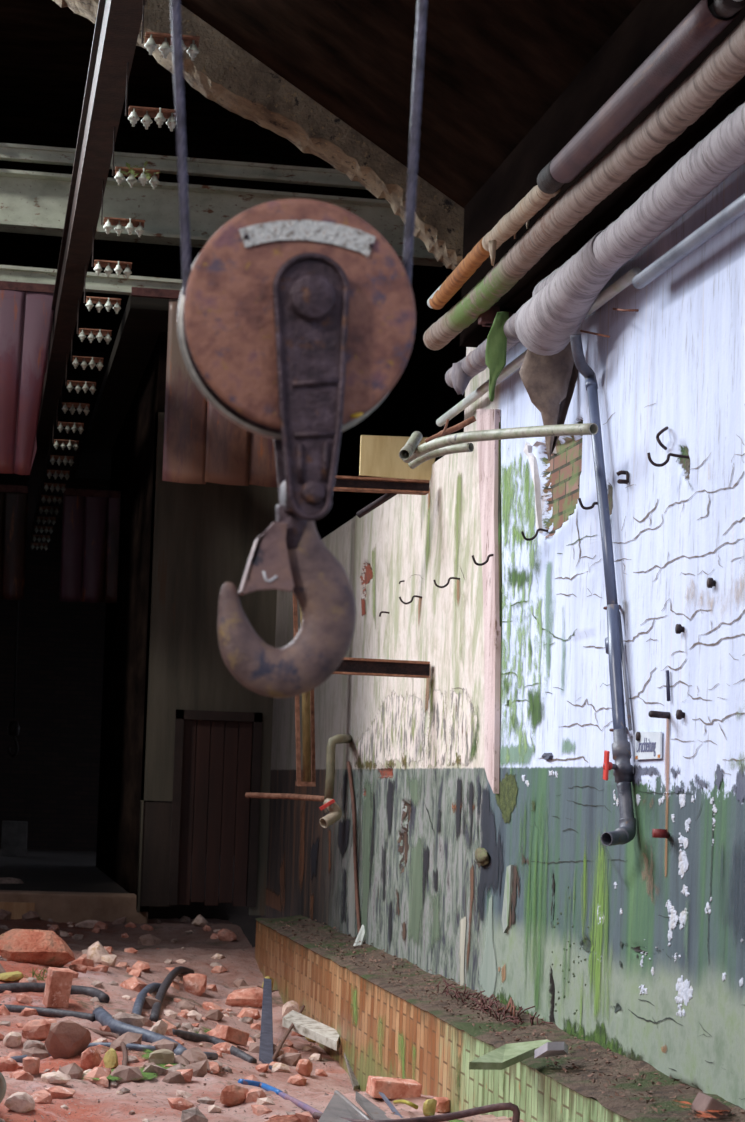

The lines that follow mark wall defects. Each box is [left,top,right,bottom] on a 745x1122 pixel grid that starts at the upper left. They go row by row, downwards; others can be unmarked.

damp [513,464,534,543]
spalling [523,418,583,539]
damp [510,689,544,731]
crack [500,436,745,959]
damp [380,774,420,944]
damp [407,837,441,948]
damp [466,782,475,848]
damp [478,895,497,997]
peeling [619,792,695,995]
peeling [675,975,693,1017]